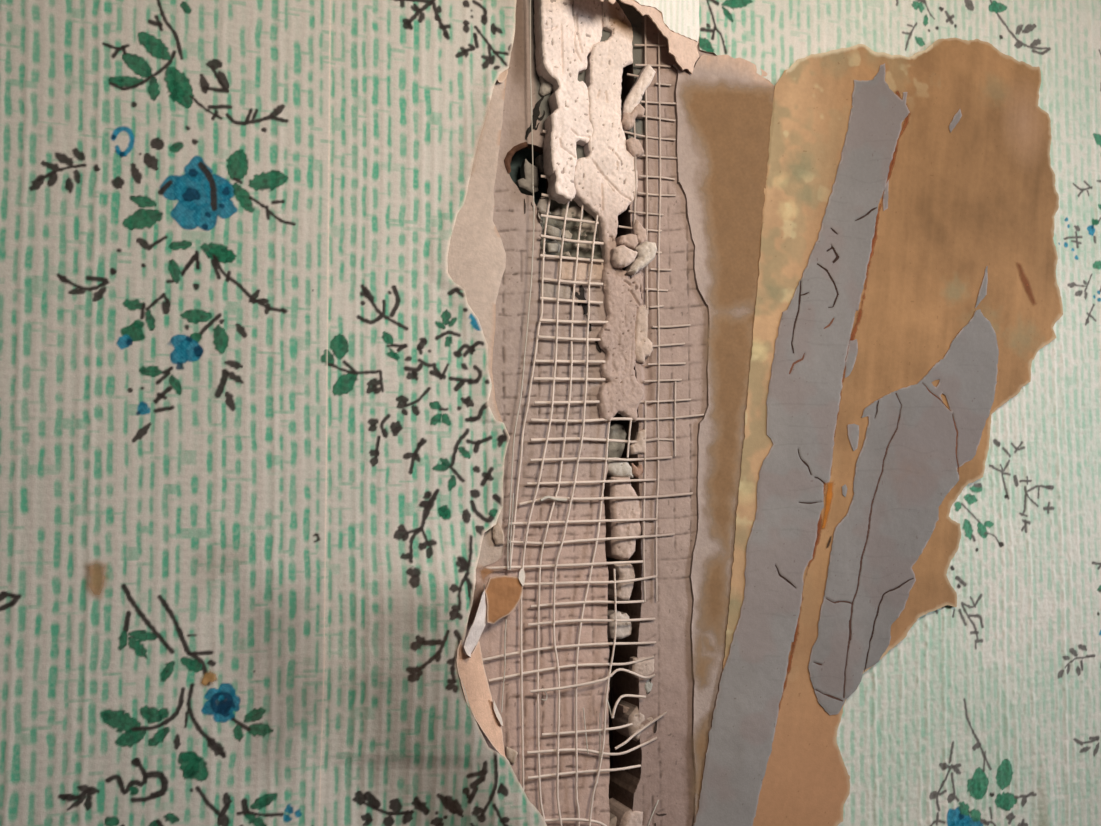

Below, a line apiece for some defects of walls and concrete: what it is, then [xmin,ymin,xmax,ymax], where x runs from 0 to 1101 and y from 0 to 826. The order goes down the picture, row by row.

crack [621,64,635,140]
peeling [448,77,507,422]
spalling [537,197,602,260]
crack [615,205,631,239]
crack [789,207,877,374]
crack [798,449,825,504]
peeling [673,54,999,826]
crack [924,384,959,474]
water stain [88,563,105,595]
crack [606,408,667,826]
crack [814,393,914,702]